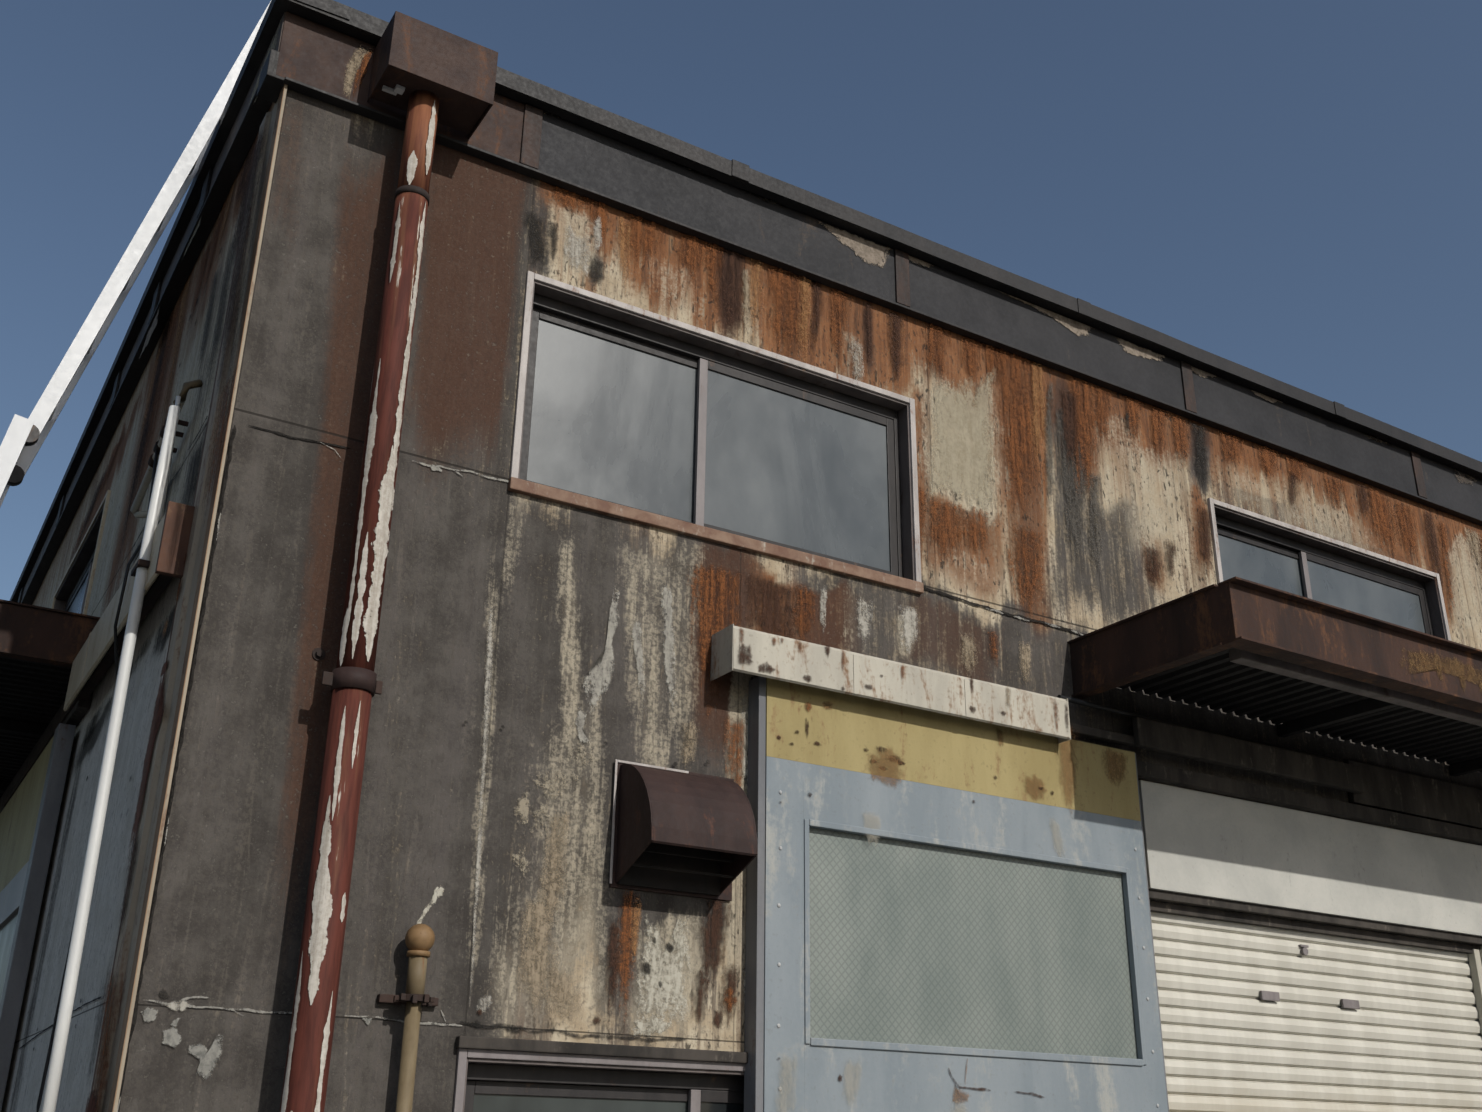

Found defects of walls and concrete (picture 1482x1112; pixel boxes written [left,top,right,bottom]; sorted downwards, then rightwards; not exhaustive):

corrosion [743,259,904,379]
corrosion [991,349,1189,504]
corrosion [918,489,988,555]
corrosion [688,566,815,695]
corrosion [119,660,168,935]
water stain [472,619,492,959]
spalling [141,1007,222,1078]
peeling [281,700,361,1112]
crack [344,1010,462,1026]
water stain [518,814,581,1018]
corrosion [606,890,641,1008]
corrosion [692,899,740,1027]